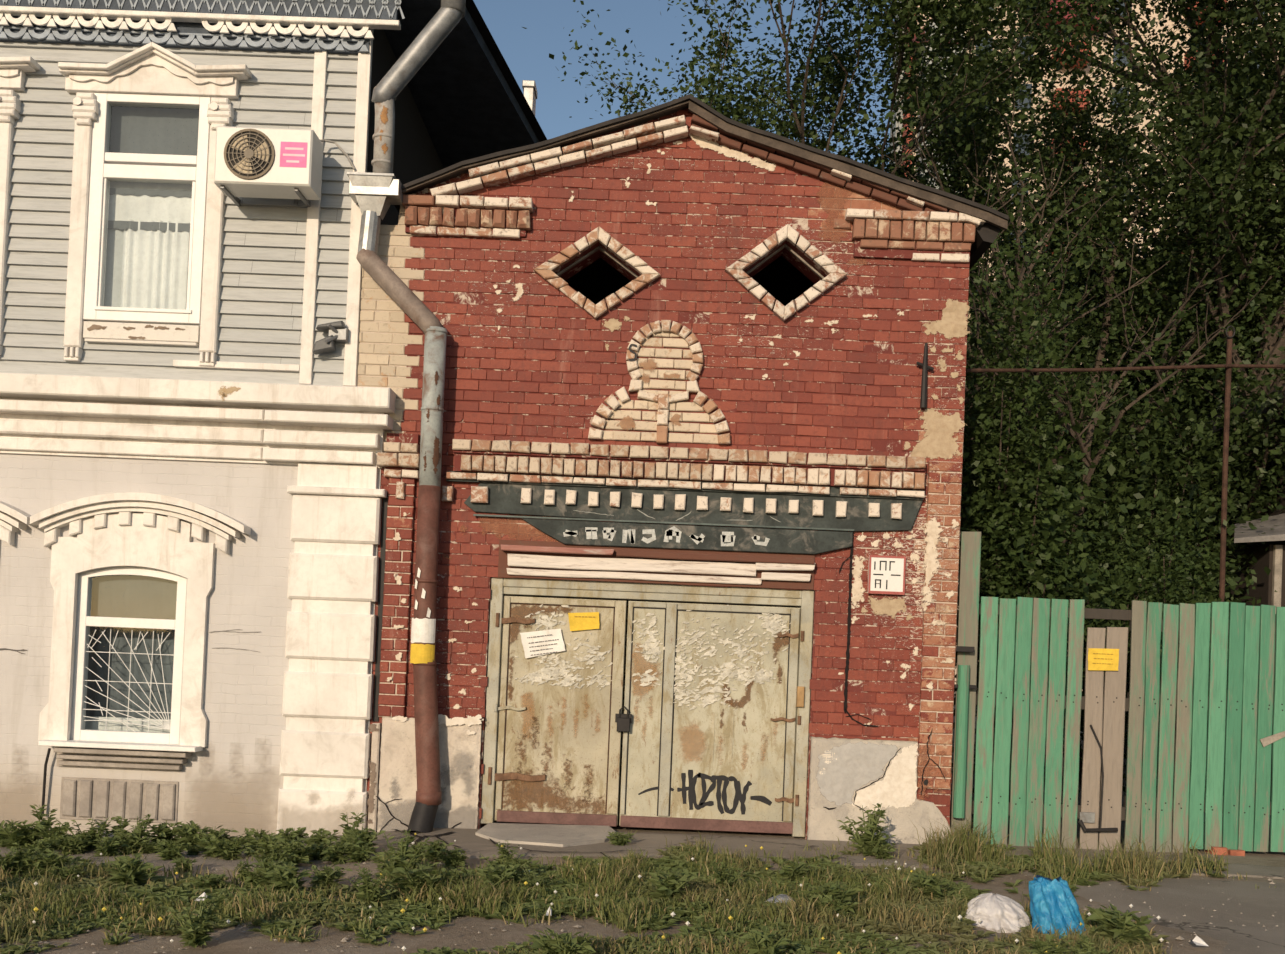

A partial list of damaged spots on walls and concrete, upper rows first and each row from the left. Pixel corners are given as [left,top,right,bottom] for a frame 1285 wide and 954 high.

rust [379,106,388,154]
peeling [123,325,185,339]
rust [219,386,240,401]
peeling [903,299,970,460]
rust [720,681,754,728]
rust [499,717,605,814]
flaking render [852,742,948,814]